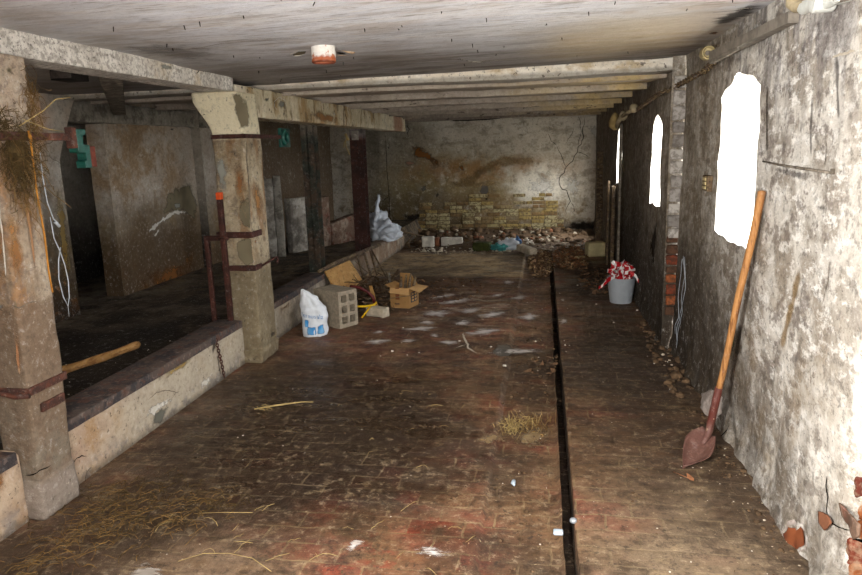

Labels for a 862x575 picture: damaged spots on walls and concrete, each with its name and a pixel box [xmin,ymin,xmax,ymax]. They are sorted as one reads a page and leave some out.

leakage [453,157,532,187]
crack [548,117,587,211]
flaking render [781,519,808,552]
flaking render [818,511,832,531]
crack [825,478,862,543]
flaking render [838,477,862,575]